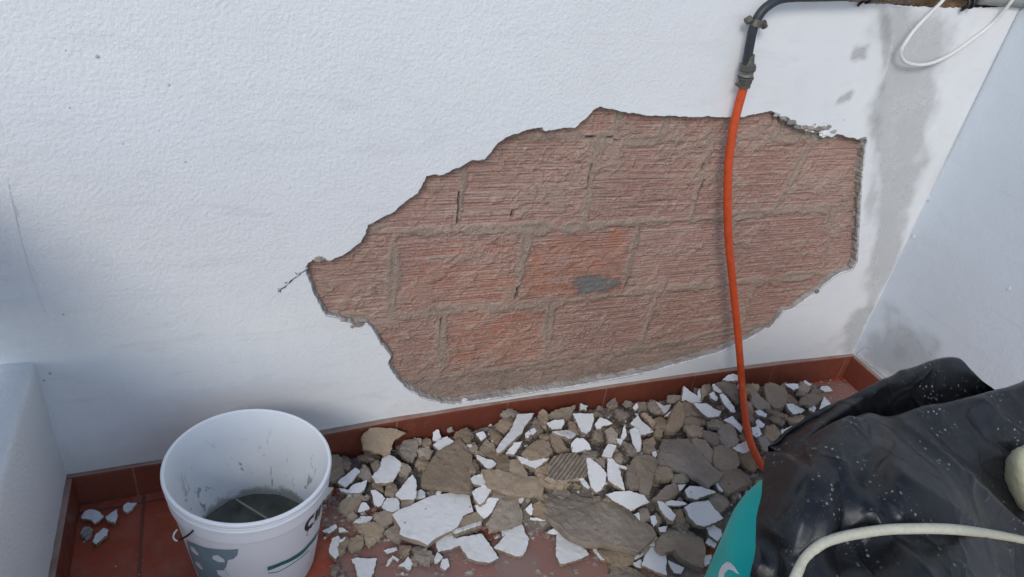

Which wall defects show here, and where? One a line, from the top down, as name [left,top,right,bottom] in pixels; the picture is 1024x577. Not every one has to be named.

flaking render [305,106,867,405]